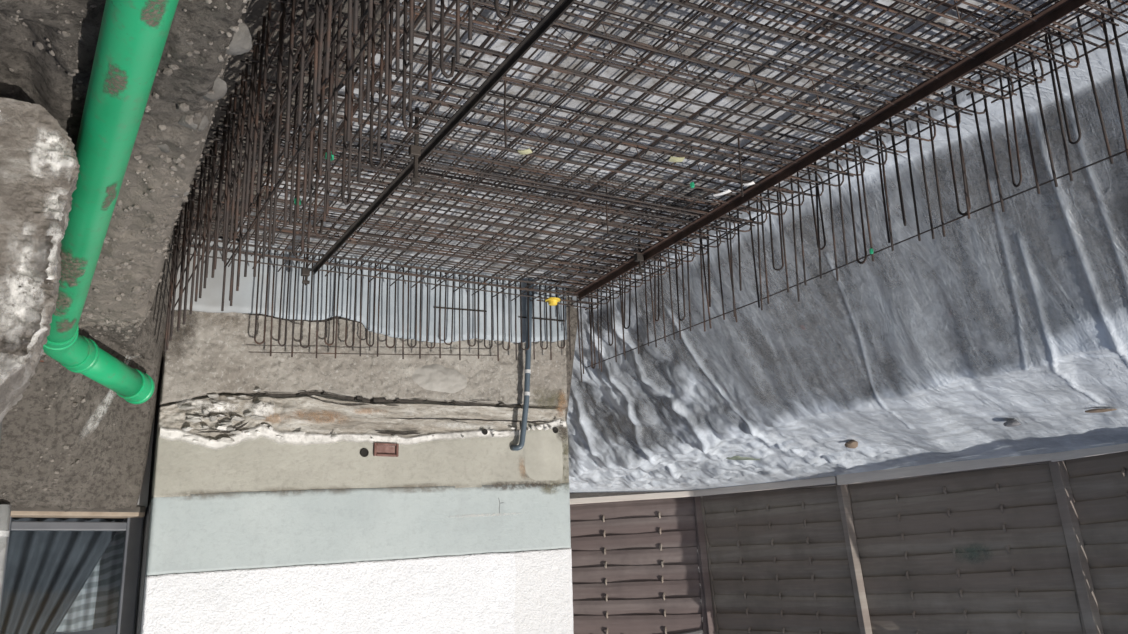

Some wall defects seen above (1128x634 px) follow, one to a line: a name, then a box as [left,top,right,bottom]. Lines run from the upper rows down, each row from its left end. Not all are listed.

flaking render [160,388,566,457]
crack [195,391,562,435]